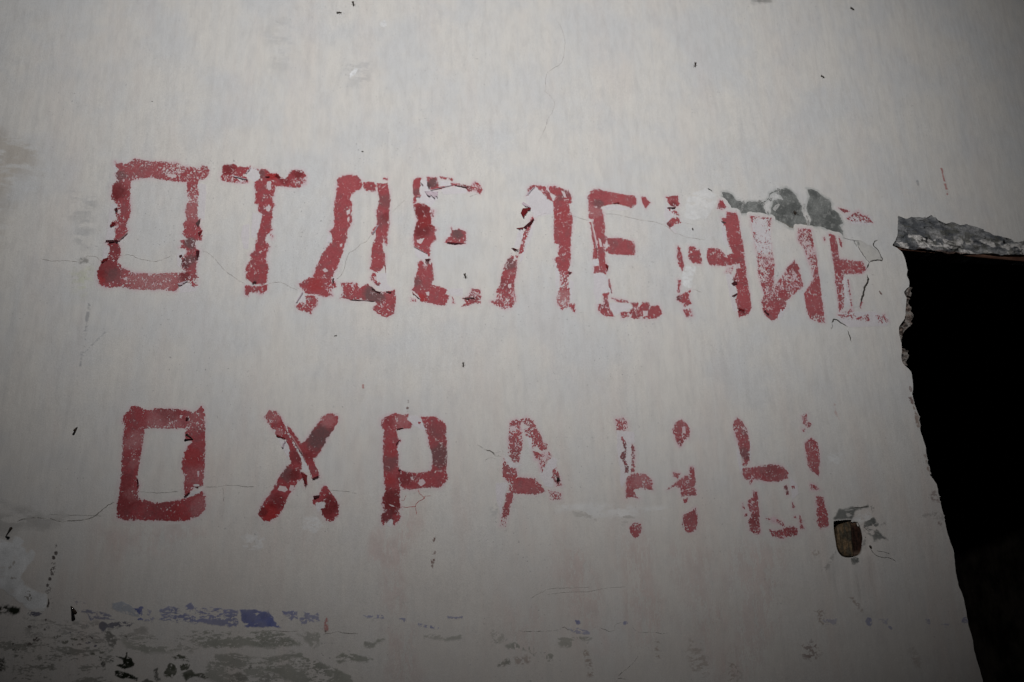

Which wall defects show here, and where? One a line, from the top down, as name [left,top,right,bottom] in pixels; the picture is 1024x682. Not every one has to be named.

flaking render [719,185,882,262]
flaking render [893,216,1024,266]
flaking render [832,503,889,566]